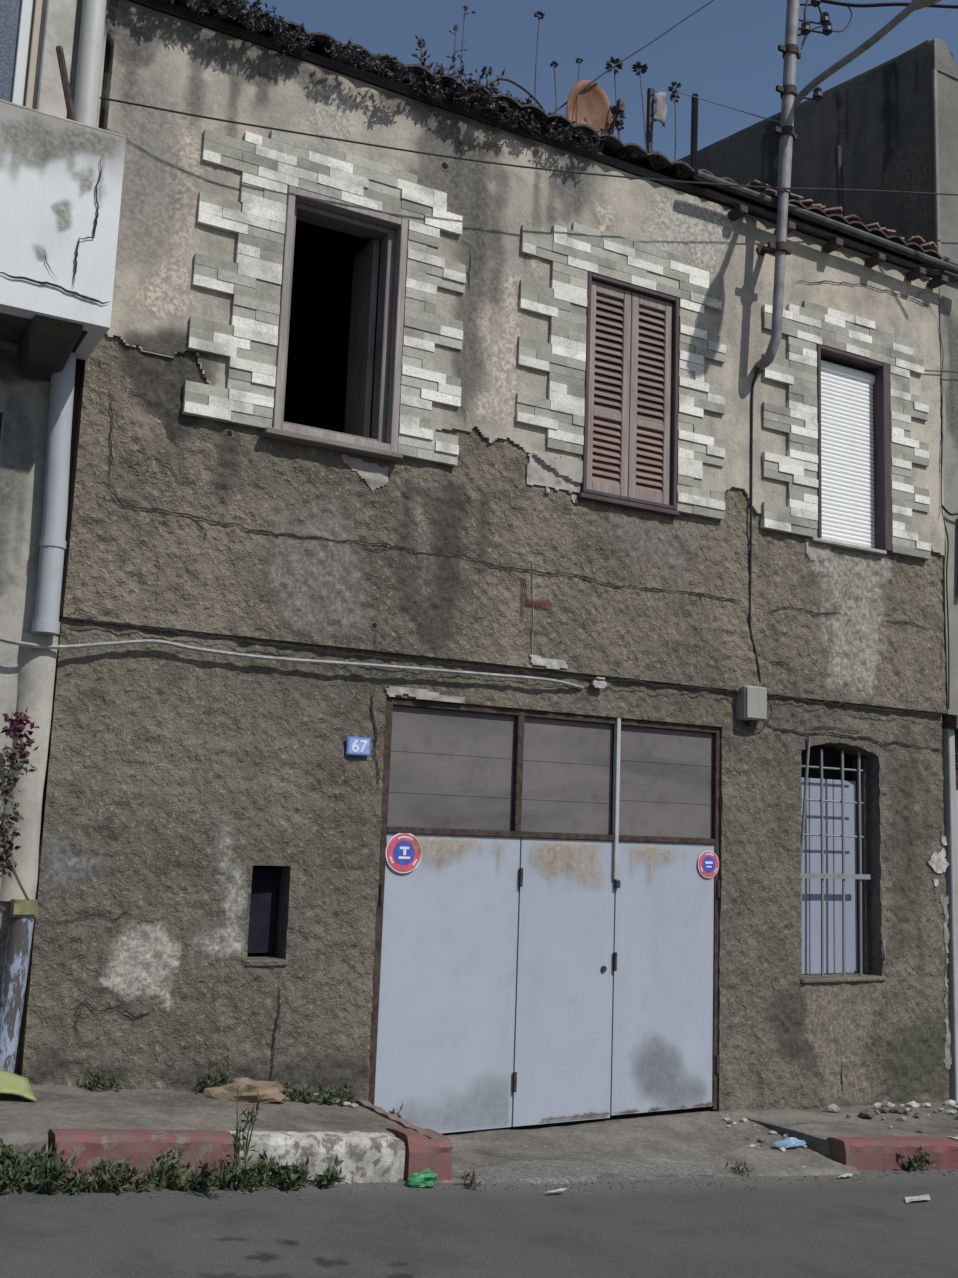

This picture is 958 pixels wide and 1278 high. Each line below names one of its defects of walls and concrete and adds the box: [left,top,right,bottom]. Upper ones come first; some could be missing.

crack [0,157,111,304]
leakage [556,147,612,231]
leakage [645,197,732,271]
leakage [762,120,780,190]
crack [796,280,943,521]
peeling [341,454,389,492]
crack [109,390,838,614]
peeling [526,453,583,504]
rust [521,581,551,616]
peeling [100,923,180,1010]
flaking render [927,836,952,1070]
crack [73,999,160,1046]